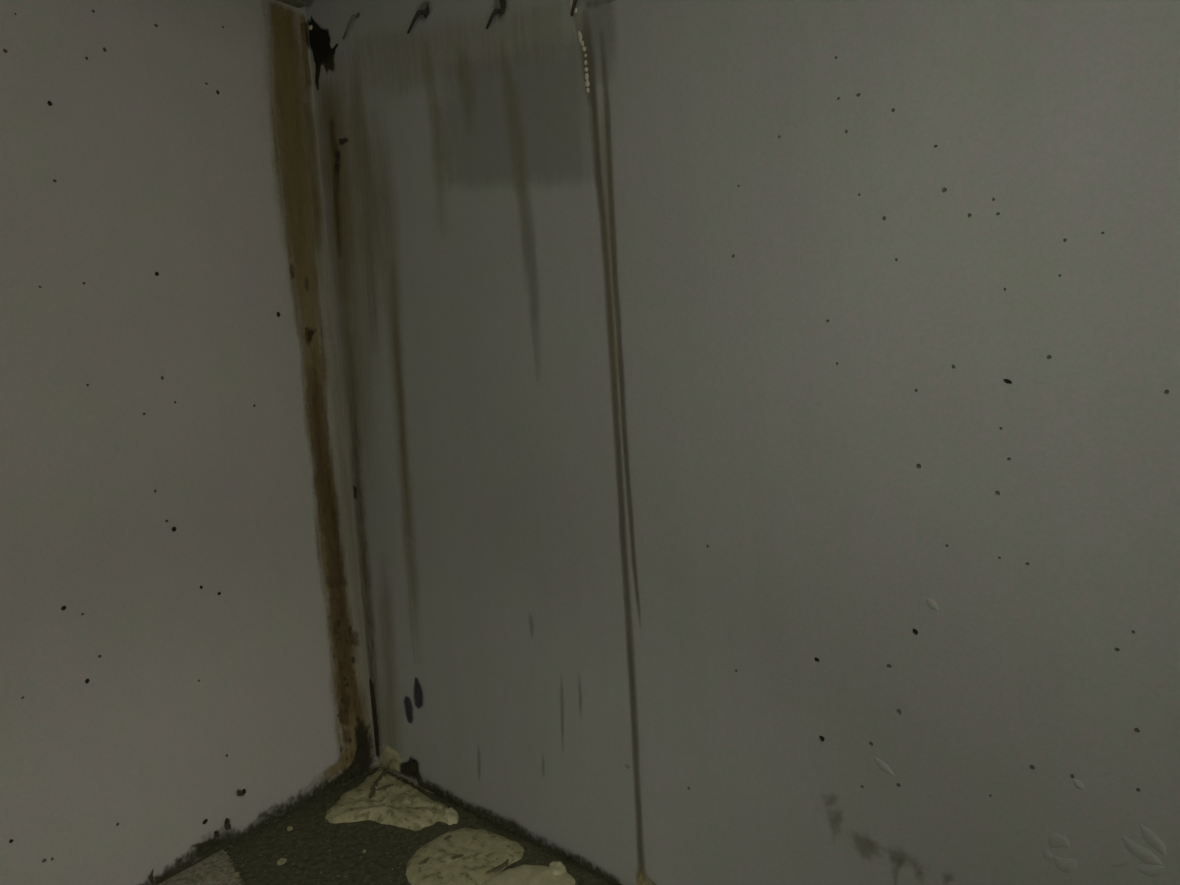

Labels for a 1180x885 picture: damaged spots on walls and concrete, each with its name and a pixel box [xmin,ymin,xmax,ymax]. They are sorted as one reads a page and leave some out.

rust [270,4,380,766]
leakage [141,31,647,885]